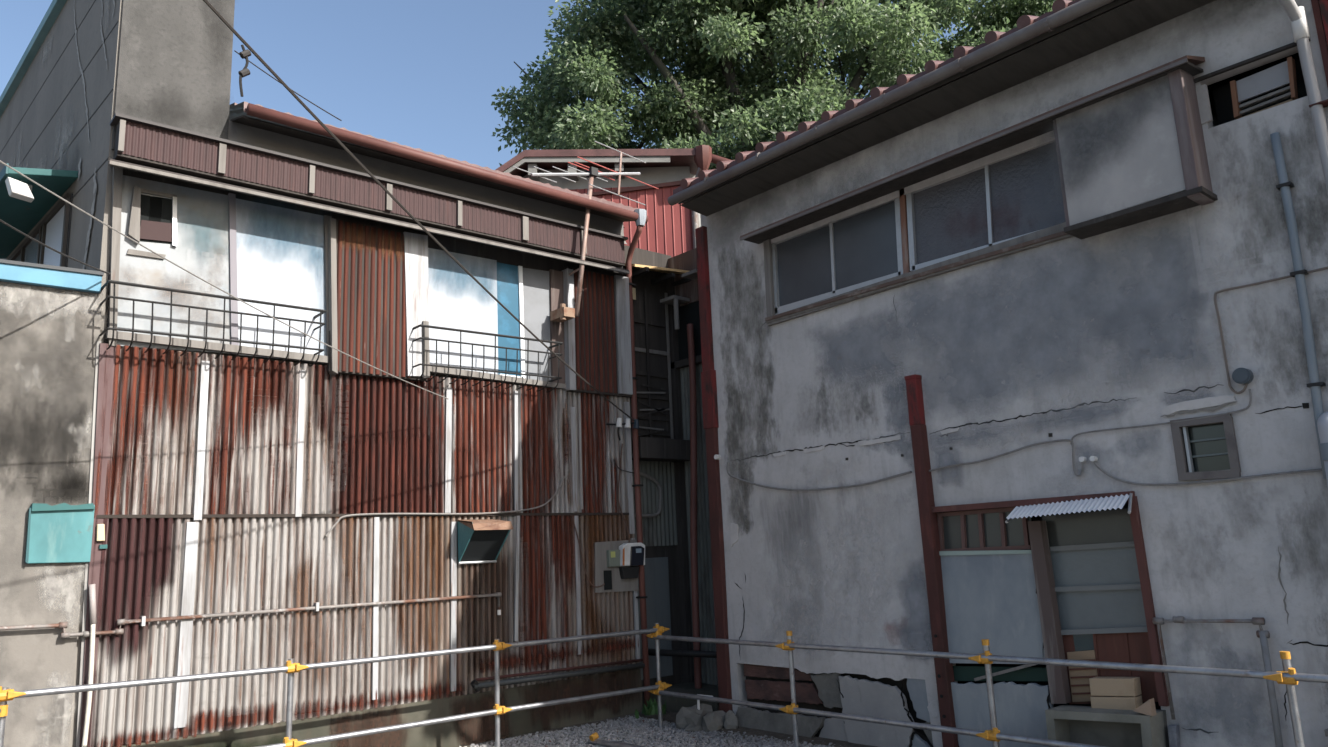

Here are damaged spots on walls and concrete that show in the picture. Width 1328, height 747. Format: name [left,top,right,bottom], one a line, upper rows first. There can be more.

crack [74,0,115,269]
water stain [721,255,772,387]
water stain [0,354,90,505]
crack [730,398,1133,461]
crack [1164,384,1220,395]
rust [87,345,640,747]
crack [901,680,933,747]